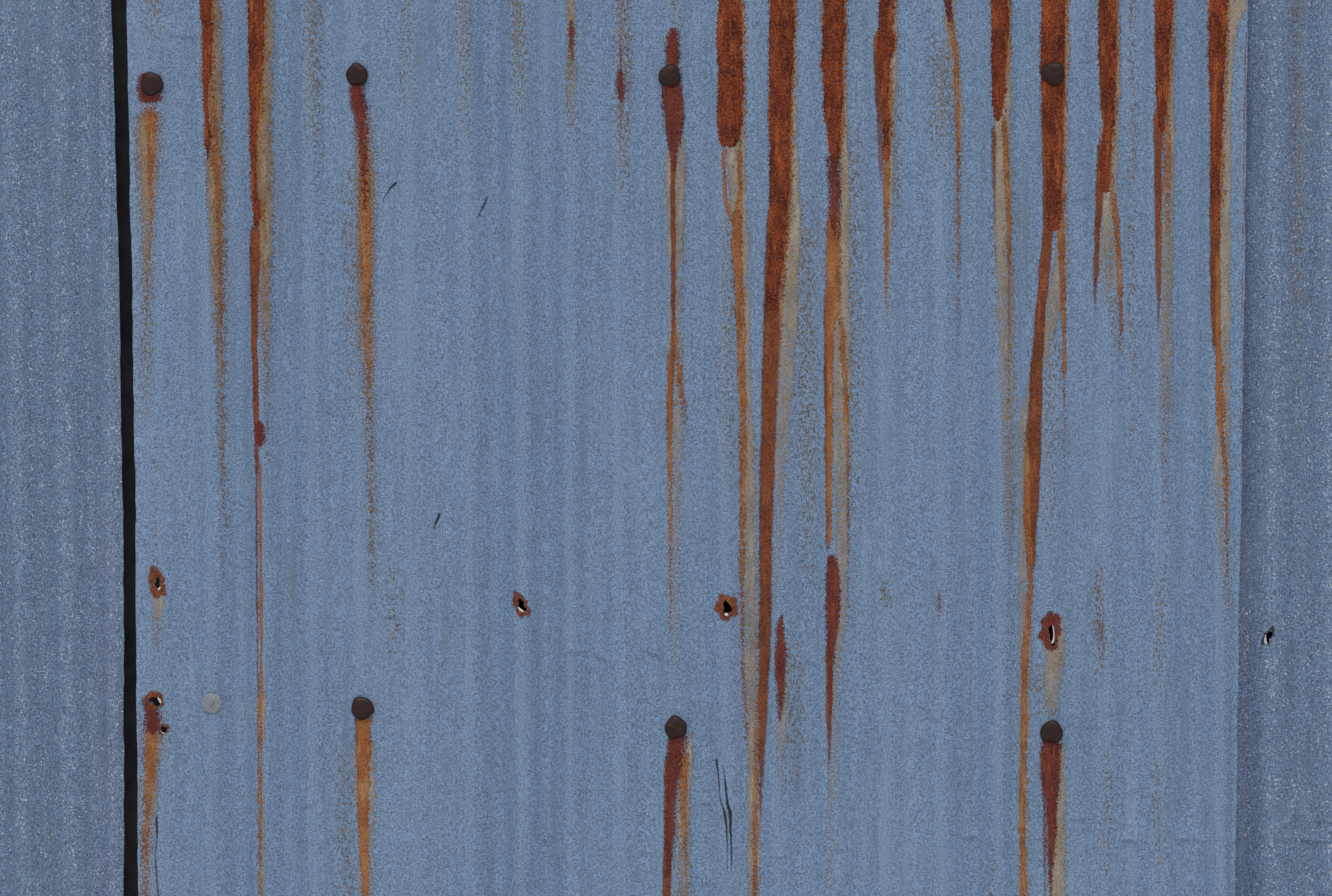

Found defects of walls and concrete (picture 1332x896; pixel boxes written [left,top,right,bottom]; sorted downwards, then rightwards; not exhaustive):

corrosion [199,0,229,527]
corrosion [246,0,277,896]
corrosion [348,84,380,615]
corrosion [660,27,689,669]
corrosion [714,0,803,896]
corrosion [819,0,853,896]
corrosion [873,0,900,361]
corrosion [989,0,1071,896]
corrosion [1093,0,1125,354]
corrosion [1153,0,1177,469]
corrosion [1206,0,1247,615]
corrosion [663,730,694,896]